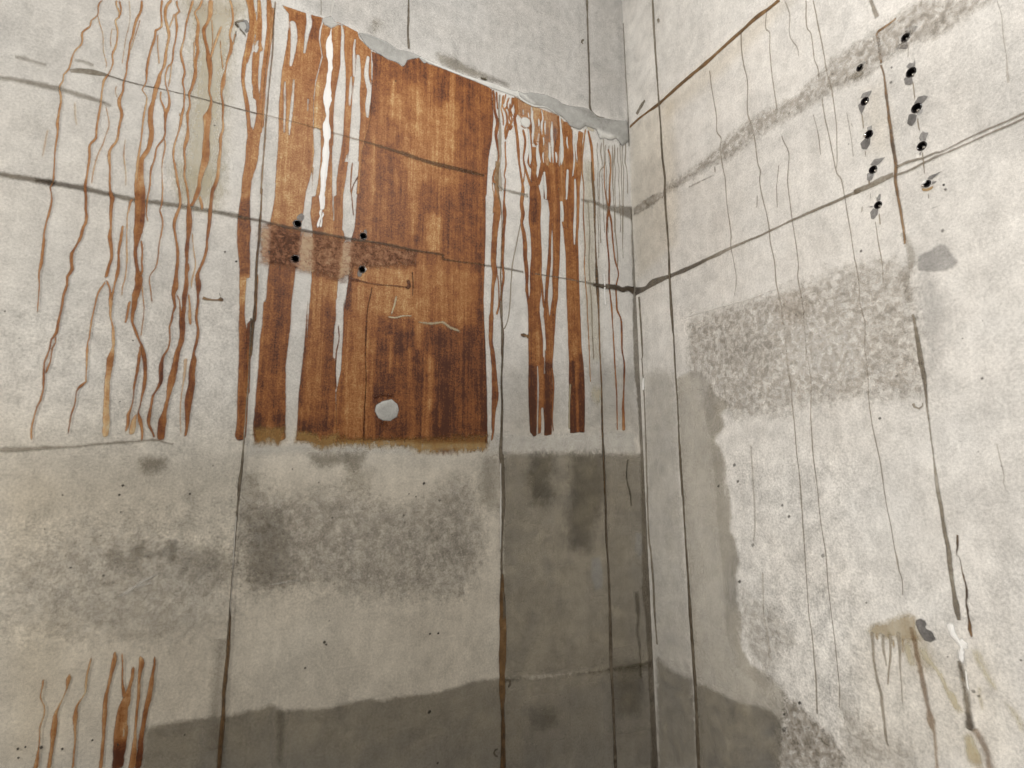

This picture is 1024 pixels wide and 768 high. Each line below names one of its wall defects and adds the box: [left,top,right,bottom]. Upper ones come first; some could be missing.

peeling [359,33,518,97]
corrosion [30,0,585,454]
leakage [709,71,736,273]
leakage [947,623,964,662]
corrosion [33,674,71,768]
corrosion [72,658,92,768]
corrosion [99,652,156,768]